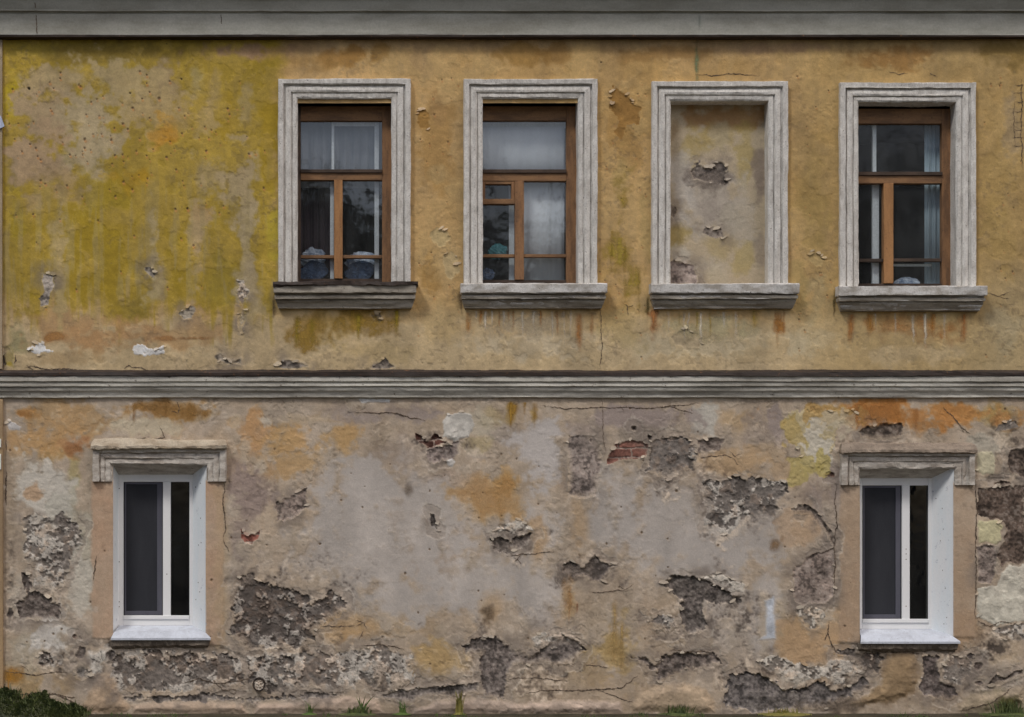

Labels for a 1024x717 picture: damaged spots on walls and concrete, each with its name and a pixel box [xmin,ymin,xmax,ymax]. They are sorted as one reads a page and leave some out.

spalling [691,160,731,186]
peeling [415,410,475,467]
spalling [566,426,725,499]
spalling [6,511,83,626]
spalling [490,517,534,555]
spalling [562,554,618,583]
spalling [700,473,837,630]
crack [829,484,838,591]
spalling [975,448,1024,642]
spalling [72,573,587,707]
spalling [631,647,886,714]